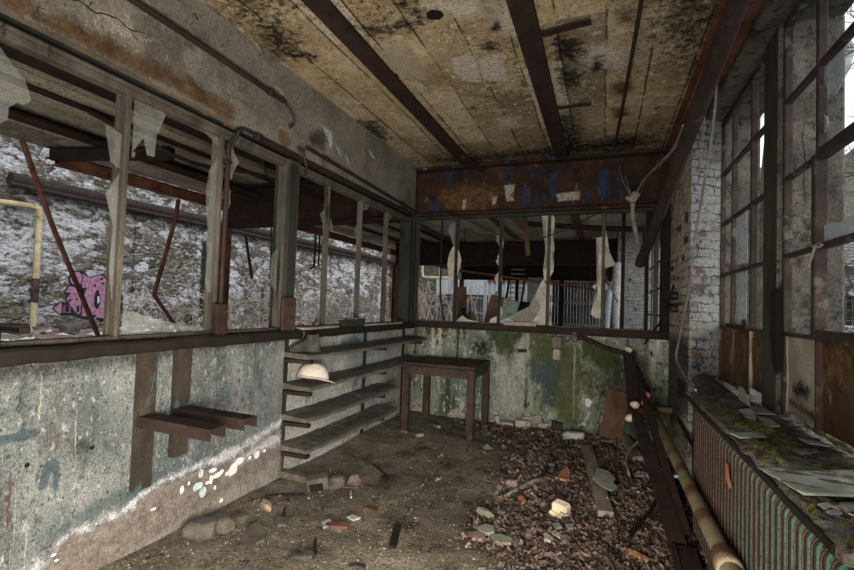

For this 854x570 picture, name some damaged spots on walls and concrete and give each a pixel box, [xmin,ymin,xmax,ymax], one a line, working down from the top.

rust [0,0,237,131]
crack [74,0,166,46]
water stain [209,0,318,64]
water stain [549,35,630,92]
water stain [629,0,717,67]
spalling [671,212,706,249]
water stain [0,371,42,445]
water stain [493,334,529,417]
water stain [24,413,282,570]